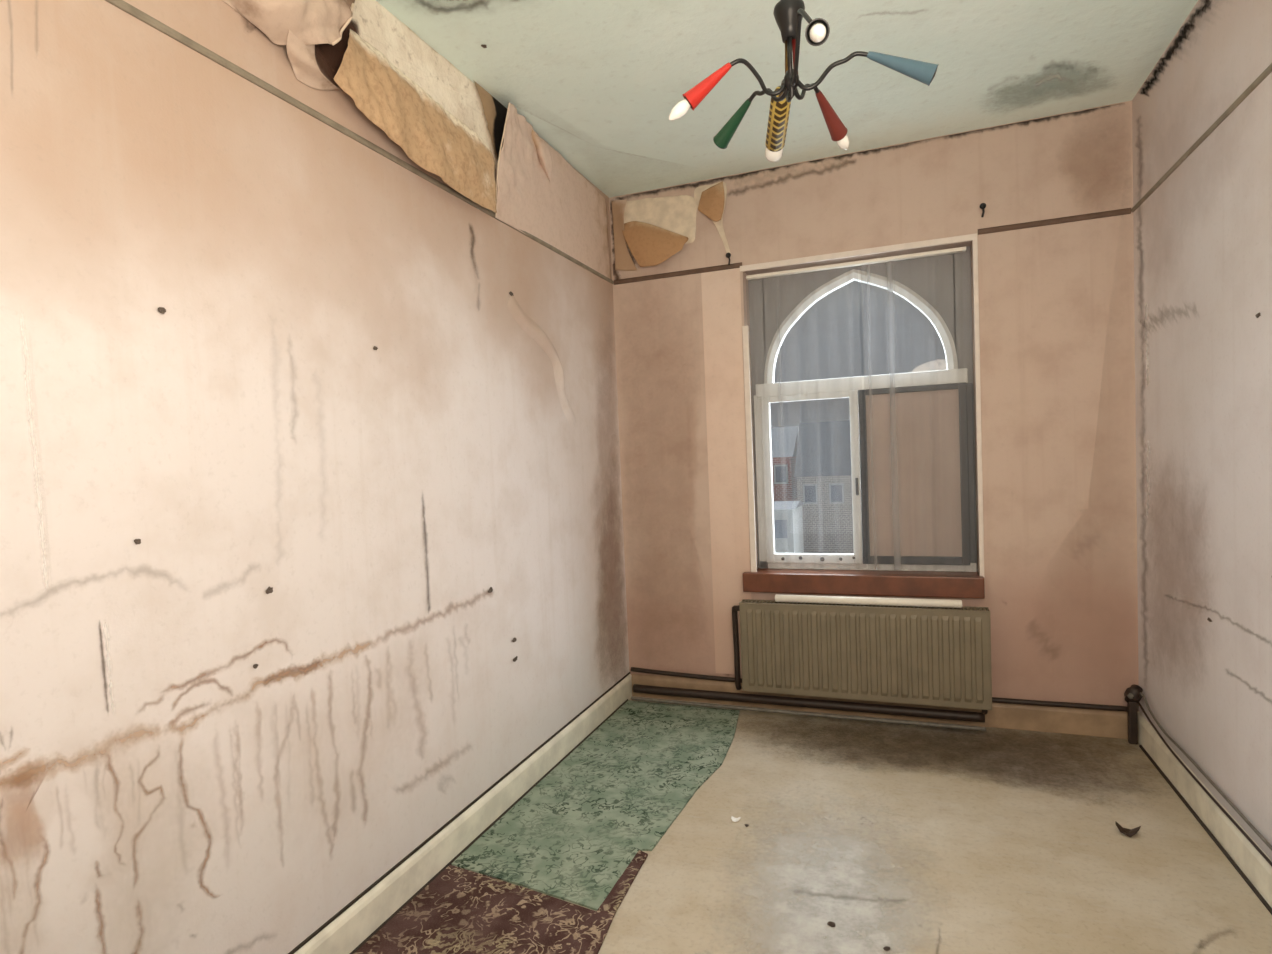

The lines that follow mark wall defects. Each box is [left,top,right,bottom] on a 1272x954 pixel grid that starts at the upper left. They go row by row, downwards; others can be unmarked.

flaking render [315,0,507,169]
flaking render [624,182,730,253]
damp [252,643,370,689]
damp [180,761,214,897]